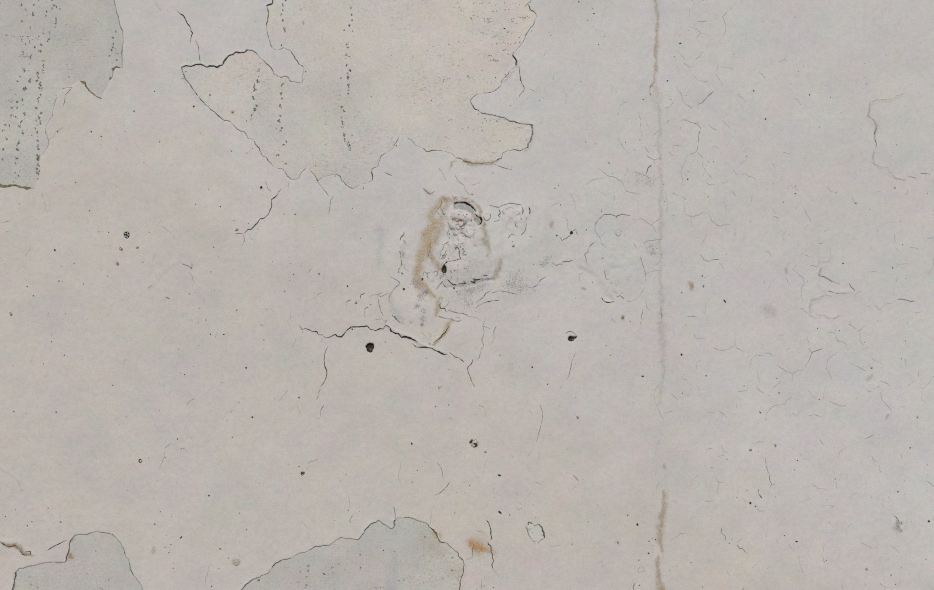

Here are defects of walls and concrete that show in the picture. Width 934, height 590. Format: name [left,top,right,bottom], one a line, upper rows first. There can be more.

peeling [0,0,124,190]
peeling [179,0,537,189]
crack [272,68,934,416]
peeling [8,532,143,590]
peeling [237,516,468,590]